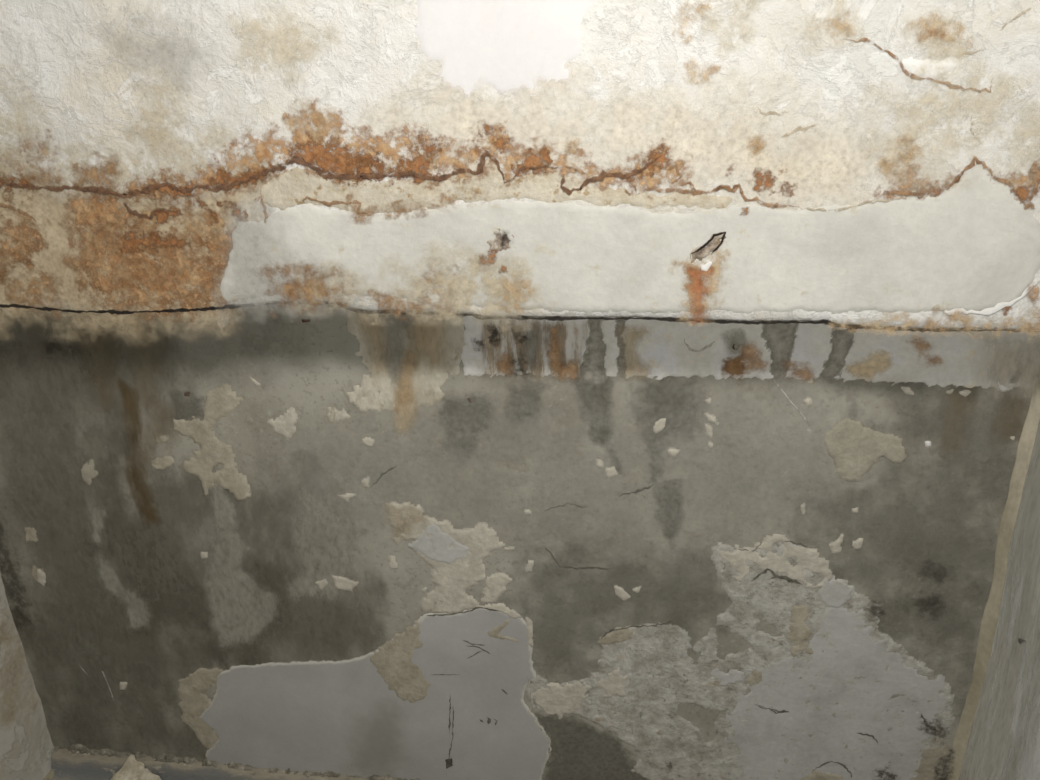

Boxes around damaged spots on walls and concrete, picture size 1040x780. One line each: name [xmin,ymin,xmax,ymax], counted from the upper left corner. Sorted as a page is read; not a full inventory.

crack [848,38,991,93]
corrosion [64,101,690,320]
flaking render [479,228,514,265]
crack [0,301,1040,333]
corrosion [482,321,580,378]
damp [434,92,865,207]
flaking render [675,232,726,325]
corrosion [753,169,793,197]
damp [0,153,373,744]
damp [626,330,699,538]
peeling [370,502,533,703]
peeling [524,533,955,780]